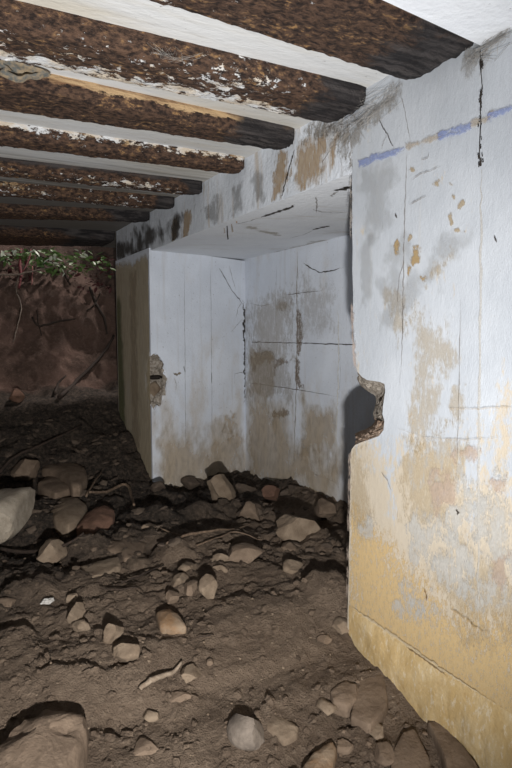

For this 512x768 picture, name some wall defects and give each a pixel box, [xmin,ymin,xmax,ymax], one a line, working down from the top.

crack [262,152,294,217]
crack [288,259,339,301]
spalling [150,354,167,409]
water stain [164,415,240,488]
water stain [250,347,288,376]
crack [219,268,353,448]
water stain [249,403,337,496]
spalling [347,305,385,529]
water stain [348,502,512,714]